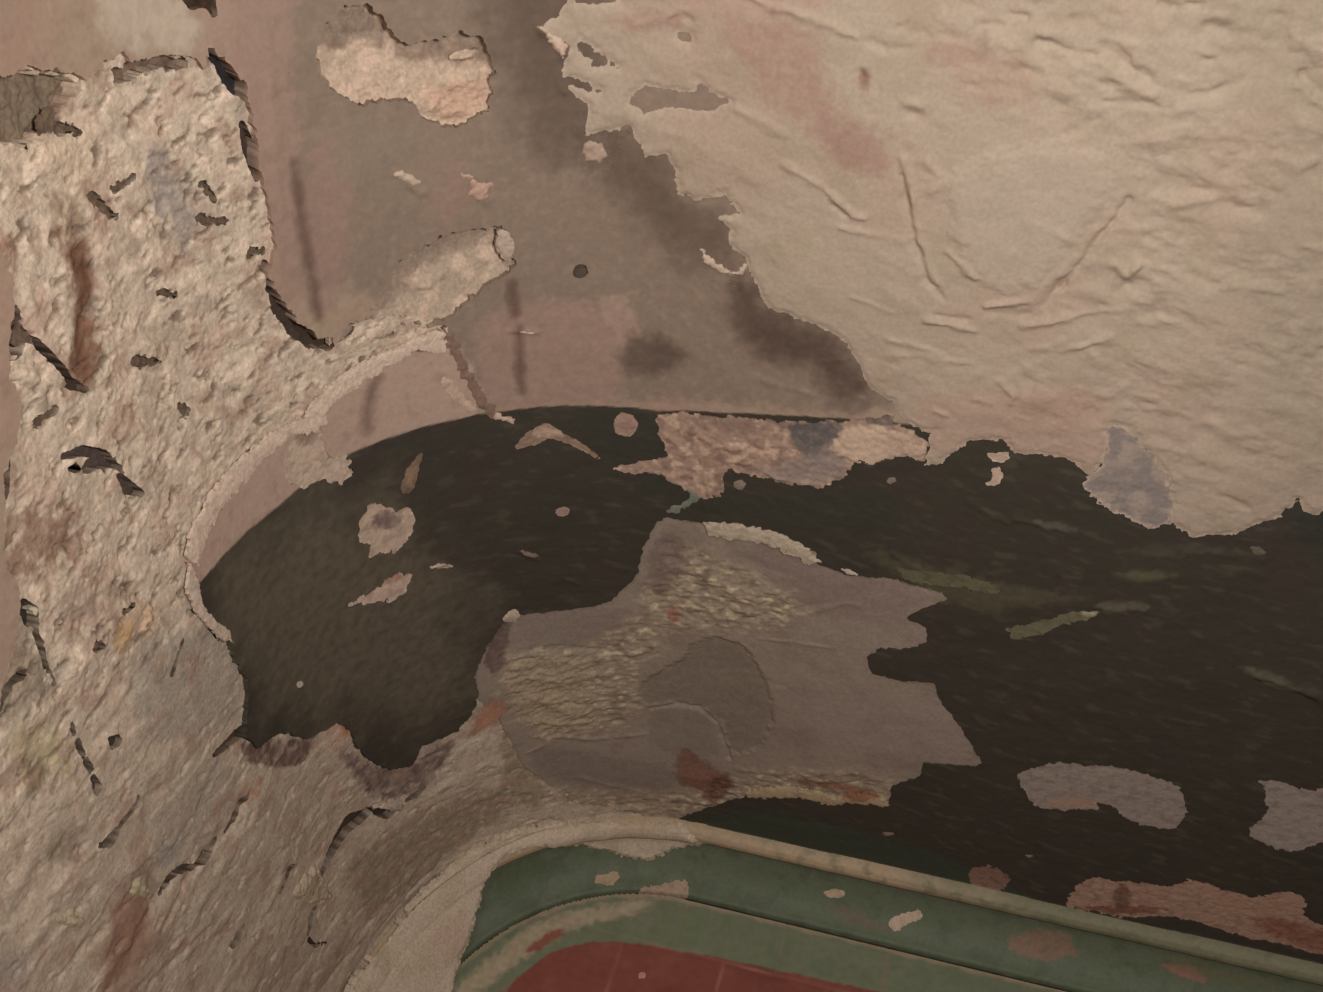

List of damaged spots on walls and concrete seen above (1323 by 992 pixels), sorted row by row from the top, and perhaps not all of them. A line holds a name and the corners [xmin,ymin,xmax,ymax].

spalling [316,4,495,125]
leakage [738,285,863,393]
spalling [0,53,1001,992]
peeling [1017,761,1188,829]
peeling [1249,780,1323,852]
peeling [1066,877,1323,954]